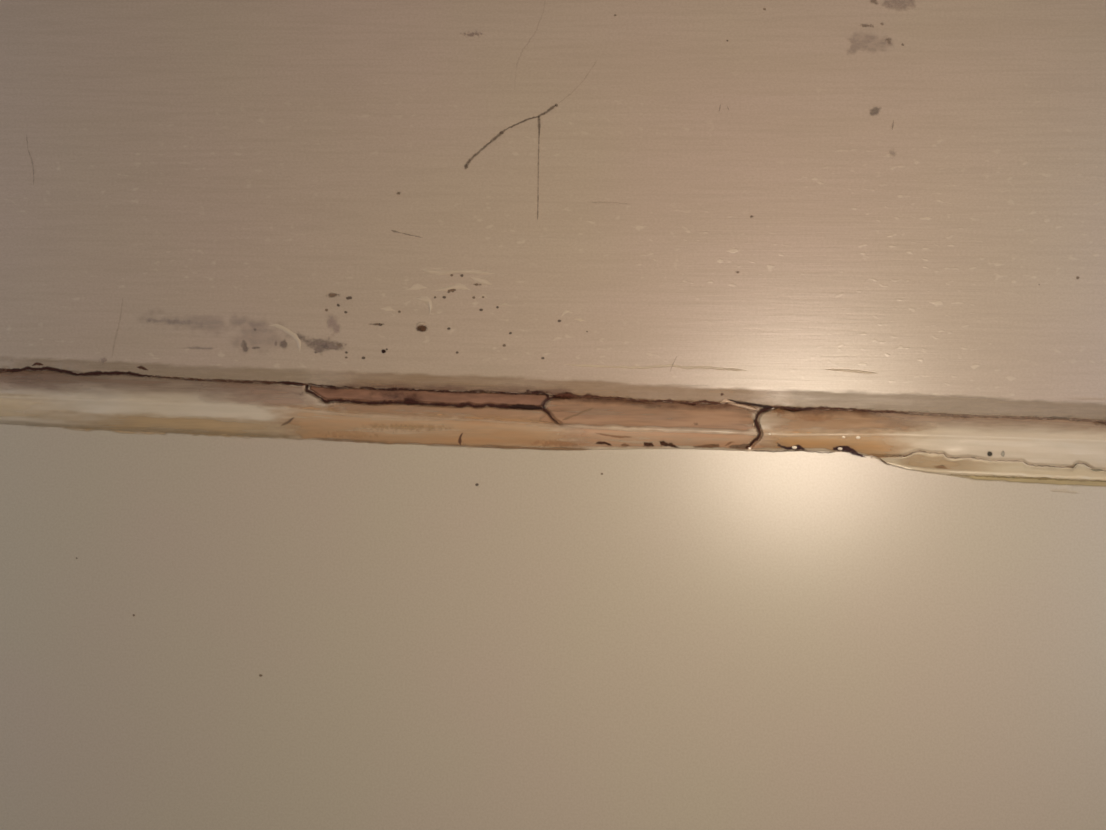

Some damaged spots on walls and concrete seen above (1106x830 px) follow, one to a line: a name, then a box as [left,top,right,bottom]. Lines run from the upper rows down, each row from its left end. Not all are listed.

crack [0,363,310,385]
spalling [306,383,547,410]
crack [527,390,1106,453]